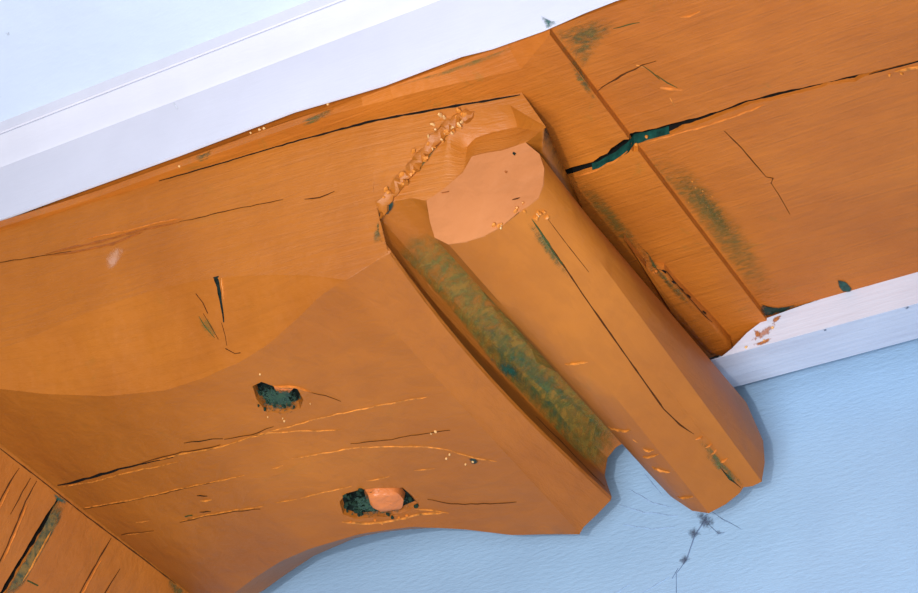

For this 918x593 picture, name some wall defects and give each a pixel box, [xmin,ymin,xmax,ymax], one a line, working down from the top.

peeling [376,108,474,236]
crack [565,61,918,214]
crack [544,221,693,434]
crack [652,269,712,322]
crack [0,392,497,593]
crack [417,499,515,513]
crack [643,512,739,593]